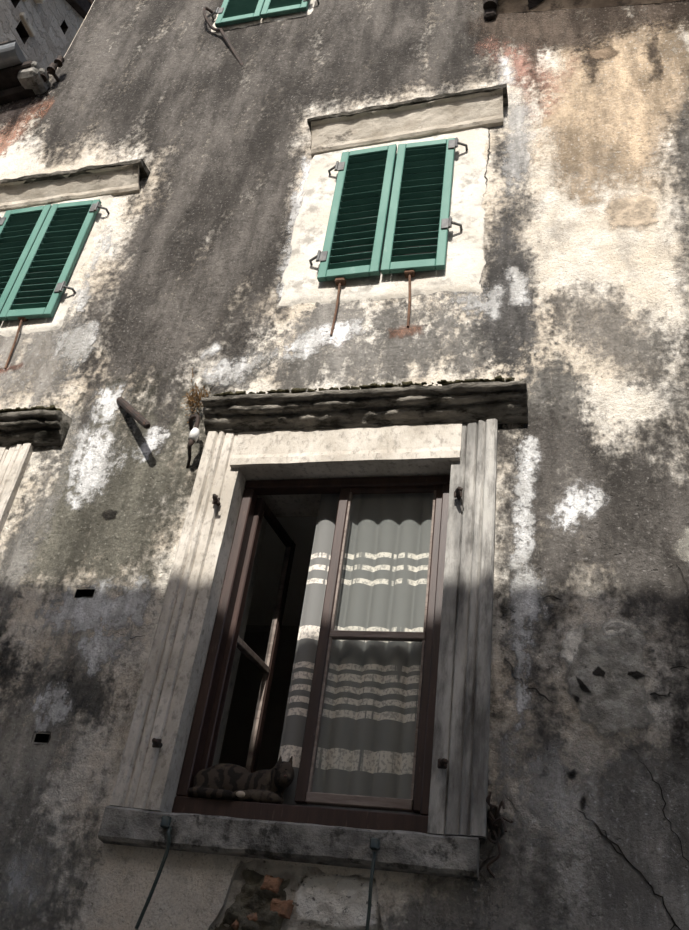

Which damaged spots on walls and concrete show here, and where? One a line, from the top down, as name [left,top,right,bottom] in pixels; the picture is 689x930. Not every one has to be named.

corrosion [0,99,54,155]
water stain [533,21,689,283]
water stain [545,283,678,390]
water stain [0,0,545,930]
water stain [386,329,689,930]
spalling [561,618,654,737]
crack [624,728,689,870]
spalling [215,869,294,930]
crack [572,805,681,930]